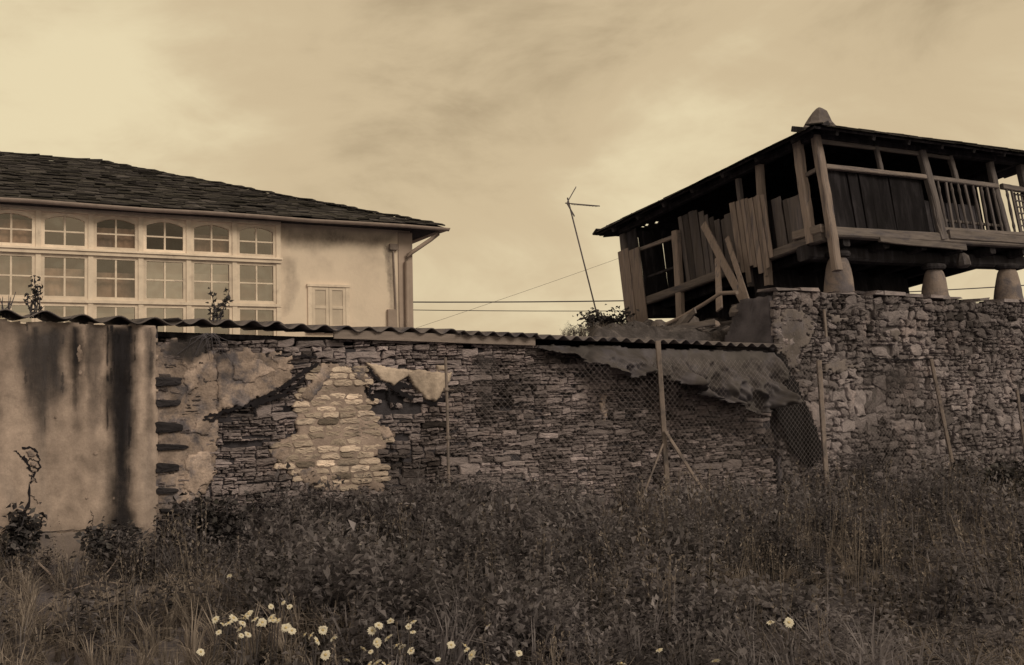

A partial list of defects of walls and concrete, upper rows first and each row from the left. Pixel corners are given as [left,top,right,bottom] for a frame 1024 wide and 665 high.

damp [20,324,136,531]
spalling [155,337,452,521]
flaking render [771,305,817,395]